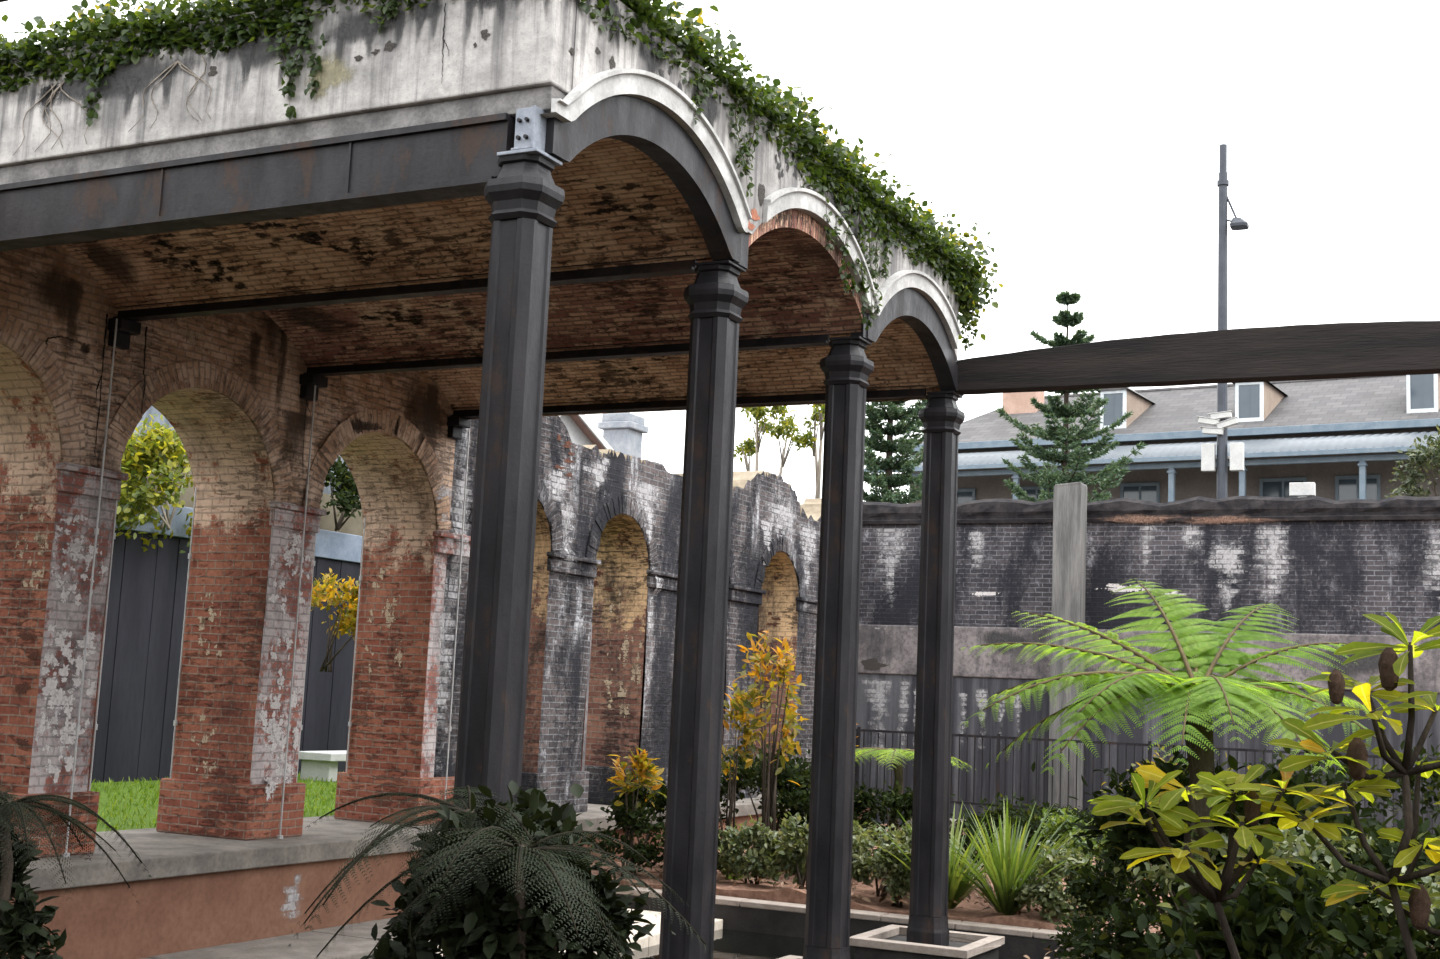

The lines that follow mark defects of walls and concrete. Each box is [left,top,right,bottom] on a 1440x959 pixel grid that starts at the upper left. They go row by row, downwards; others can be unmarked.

leakage [22,58,194,118]
leakage [224,33,302,84]
leakage [328,0,442,57]
leakage [466,0,518,29]
leakage [567,0,621,49]
leakage [81,244,133,282]
peeling [15,504,108,606]
leakage [1209,527,1289,608]
leakage [1429,530,1440,590]
peeling [255,530,311,801]
peeling [15,624,97,783]